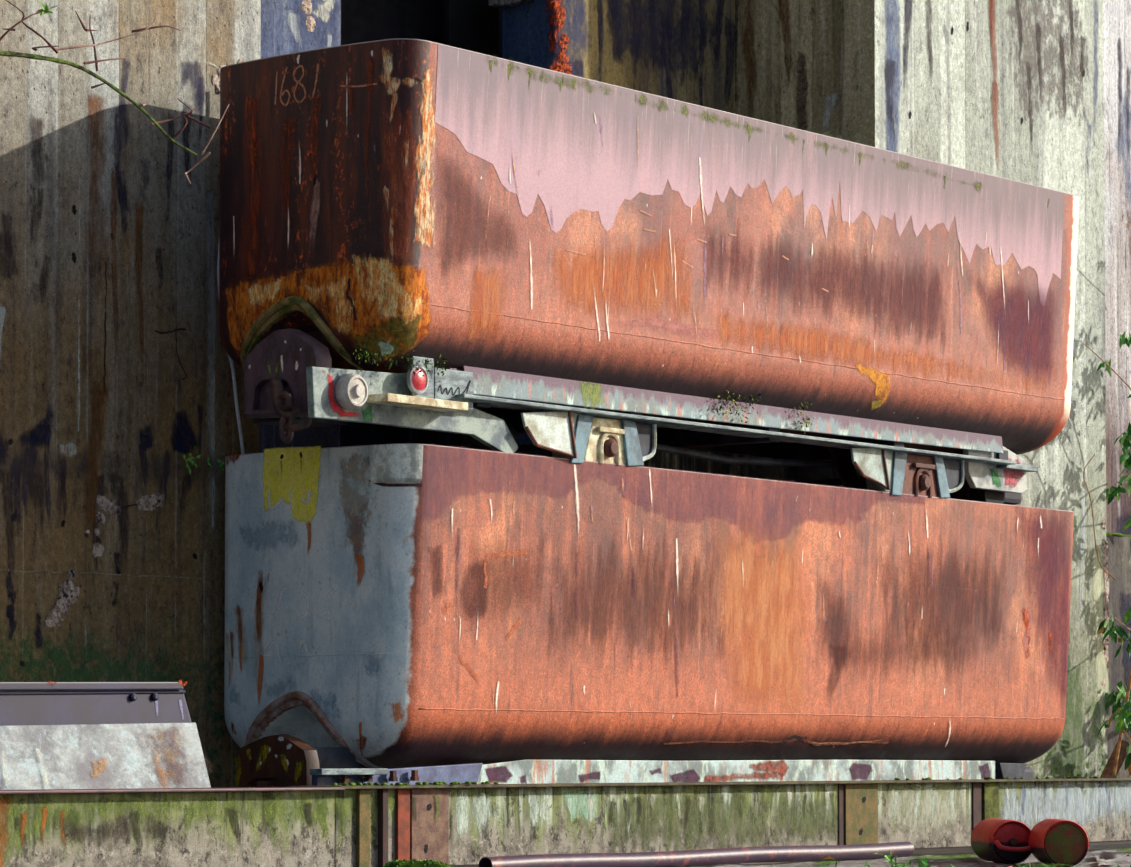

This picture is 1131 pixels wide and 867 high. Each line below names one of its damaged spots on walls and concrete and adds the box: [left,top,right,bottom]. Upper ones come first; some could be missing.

corrosion [89,96,117,273]
water stain [114,60,131,232]
water stain [167,61,205,219]
corrosion [546,0,579,76]
water stain [558,0,735,106]
corrosion [989,0,999,157]
water stain [1007,0,1098,171]
water stain [1118,39,1131,199]
corrosion [136,203,144,352]
water stain [0,409,128,577]
water stain [456,792,497,836]
water stain [565,792,597,820]